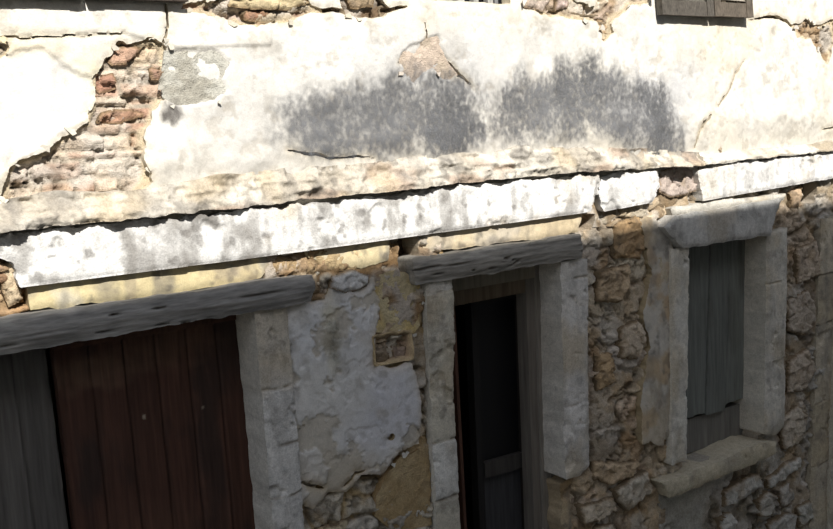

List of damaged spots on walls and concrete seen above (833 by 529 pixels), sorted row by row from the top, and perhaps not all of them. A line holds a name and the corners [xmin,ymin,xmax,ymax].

spalling [174,0,403,27]
spalling [522,0,648,41]
spalling [0,23,230,204]
leakage [285,66,484,158]
spalling [261,234,443,529]